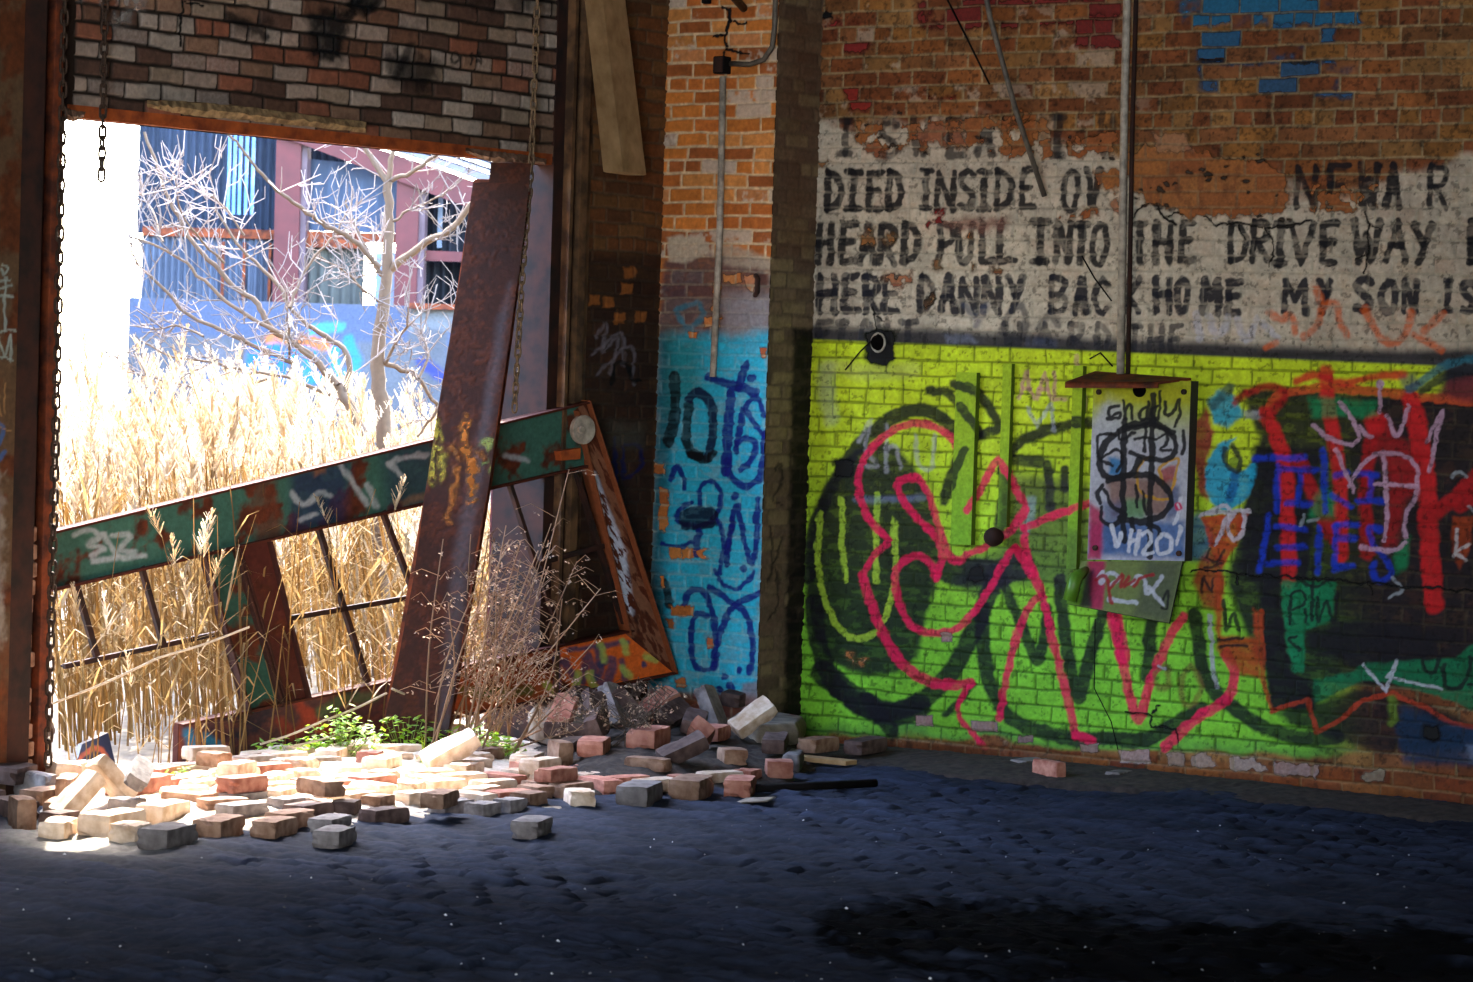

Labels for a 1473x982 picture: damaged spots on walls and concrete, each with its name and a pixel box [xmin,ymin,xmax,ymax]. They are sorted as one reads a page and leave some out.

peeling [843,88,1292,222]
peeling [1309,183,1379,214]